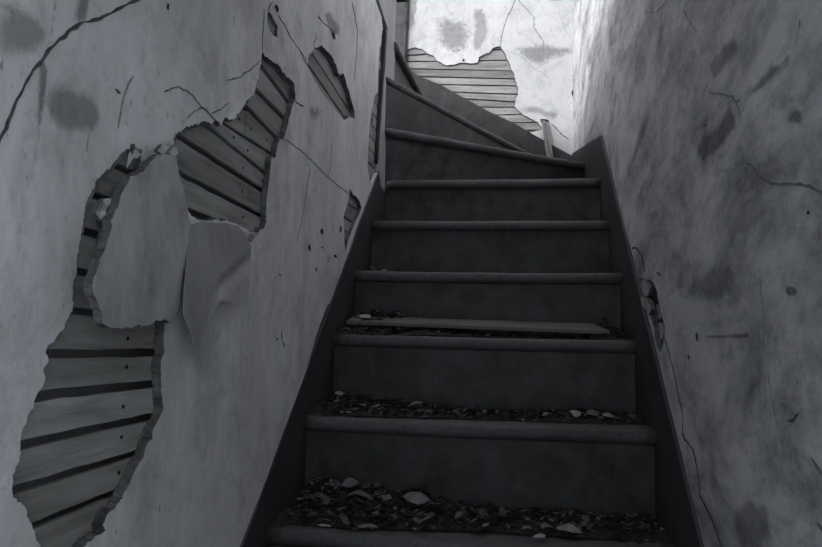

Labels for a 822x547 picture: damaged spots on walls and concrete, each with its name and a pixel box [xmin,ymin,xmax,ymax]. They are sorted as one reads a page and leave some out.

crack [0,0,140,142]
crack [165,86,228,123]
spalling [173,51,295,233]
spalling [267,5,279,37]
crack [230,3,331,80]
spalling [308,46,355,120]
damp [440,11,486,48]
spalling [407,46,550,133]
crack [500,0,572,81]
crack [745,162,822,195]
spalling [340,189,361,250]
spalling [13,149,165,547]